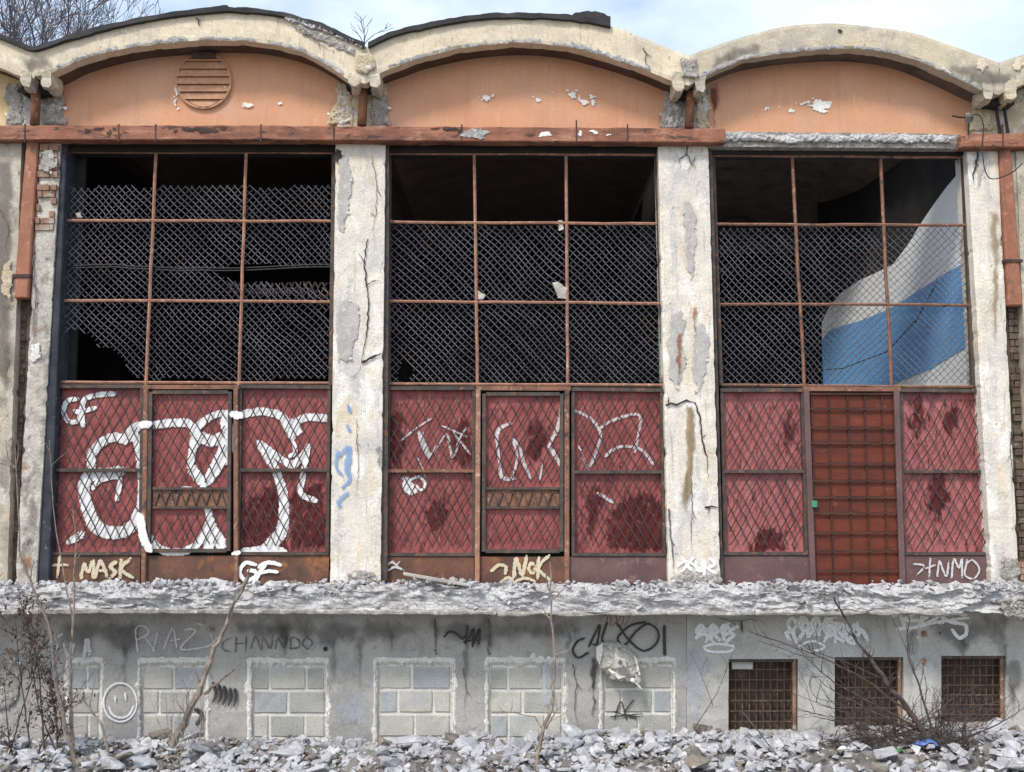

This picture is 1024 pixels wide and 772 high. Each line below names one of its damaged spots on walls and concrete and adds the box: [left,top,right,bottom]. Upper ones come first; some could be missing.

spalling [3,83,24,125]
peeling [566,89,596,106]
peeling [762,98,832,113]
spalling [725,131,955,143]
flaking render [35,145,60,231]
peeling [334,149,352,232]
crack [346,159,382,380]
peeling [682,201,698,278]
peeling [667,310,710,392]
damp [683,407,695,507]
crack [665,396,719,573]
spalling [999,595,1024,620]